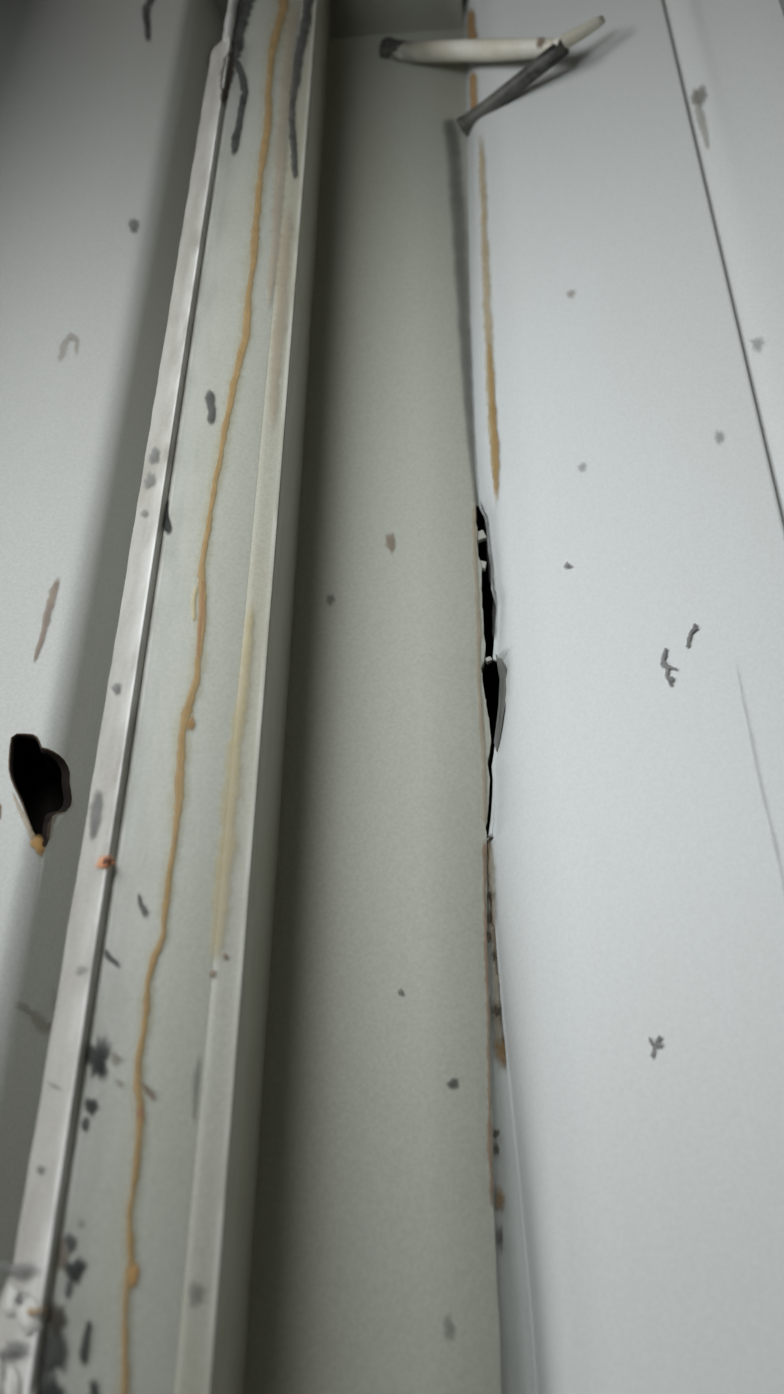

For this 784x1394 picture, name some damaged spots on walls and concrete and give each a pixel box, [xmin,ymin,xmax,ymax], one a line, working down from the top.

damp [220,0,254,153]
damp [288,0,313,177]
rust [467,11,477,39]
rust [480,150,499,493]
crack [447,122,507,835]
hole [13,739,64,838]
damp [82,1099,97,1129]
mould [86,1041,109,1075]
peeling [0,1263,43,1394]
mould [37,1234,91,1394]